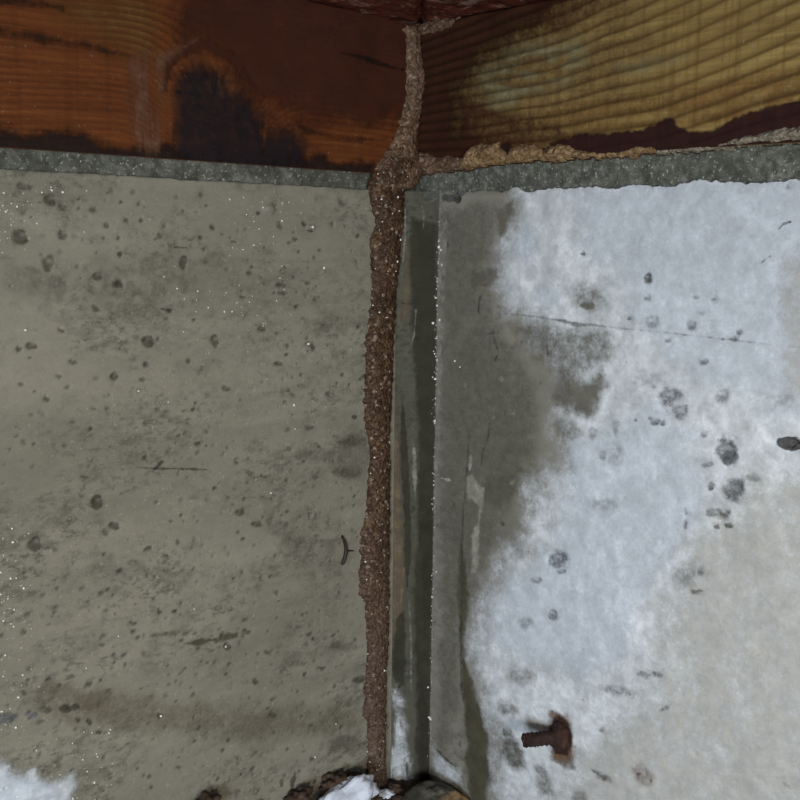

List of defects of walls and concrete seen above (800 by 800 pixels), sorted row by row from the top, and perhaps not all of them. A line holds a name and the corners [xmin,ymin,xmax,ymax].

water stain [0,0,800,173]
water stain [390,179,800,800]
rust [549,711,573,768]